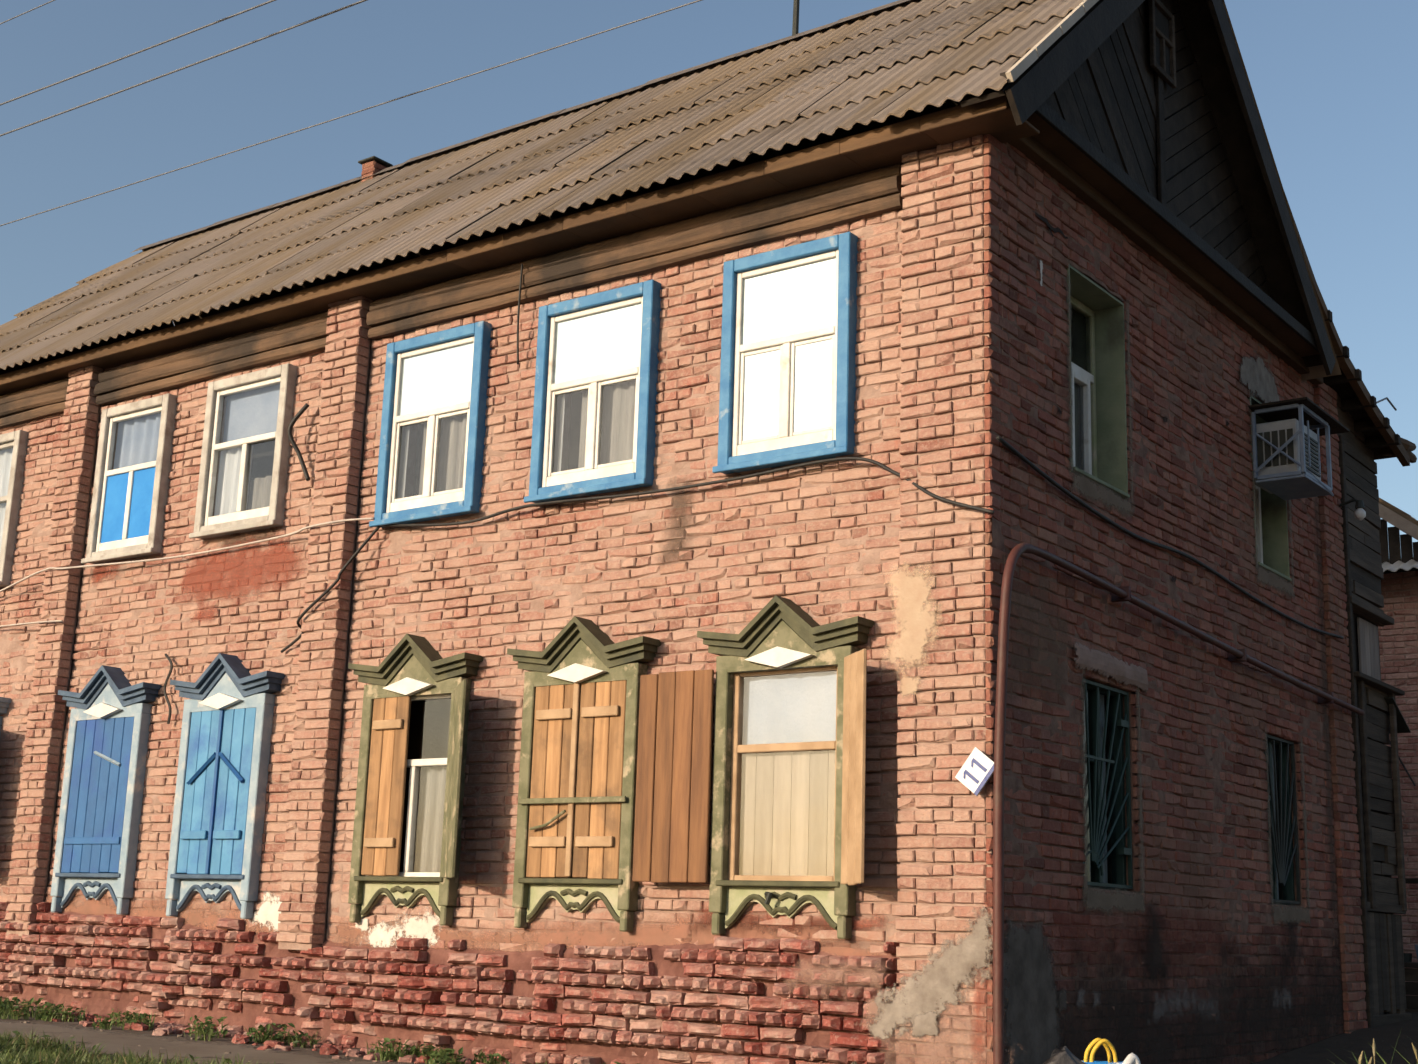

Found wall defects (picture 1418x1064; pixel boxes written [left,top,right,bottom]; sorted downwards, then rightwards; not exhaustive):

spalling [0,902,938,1064]
damp [1057,908,1345,1064]